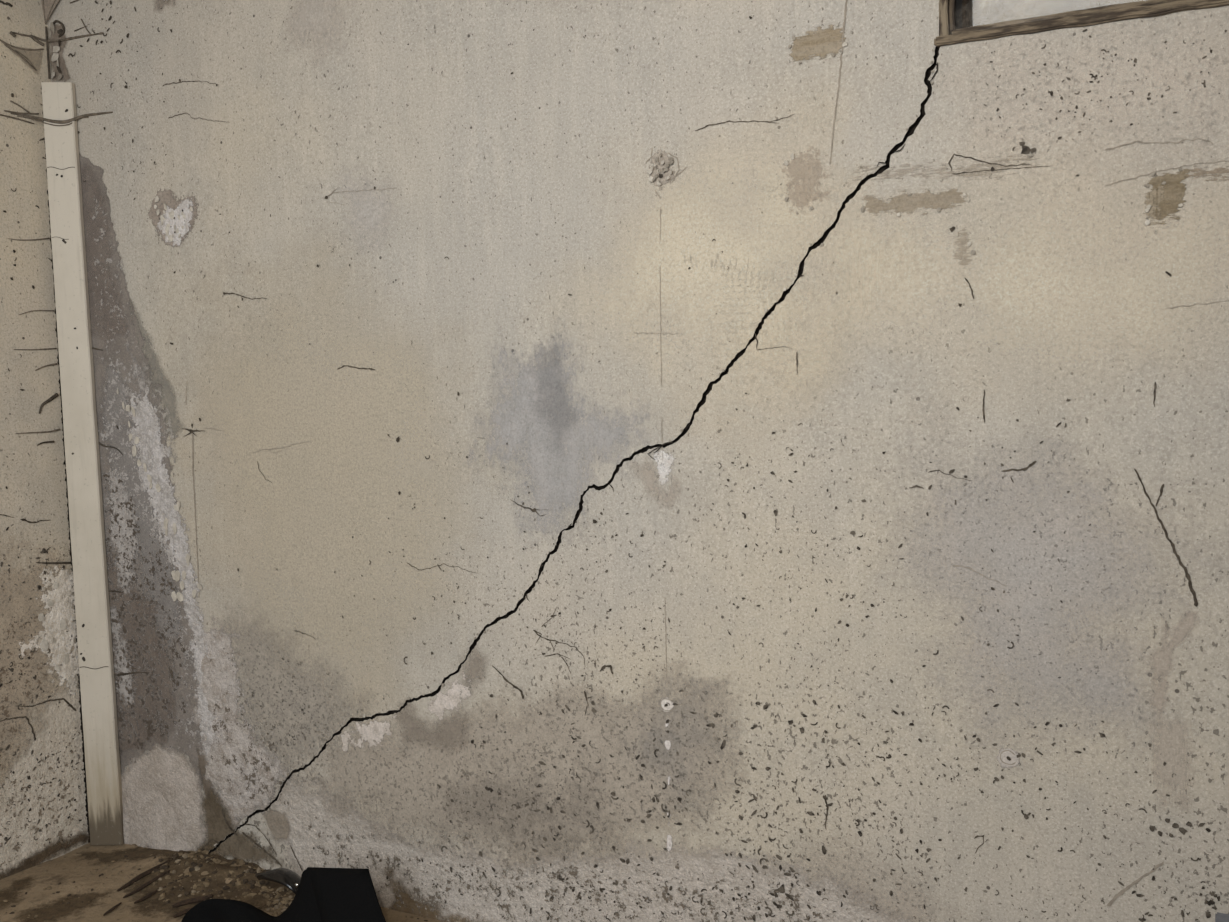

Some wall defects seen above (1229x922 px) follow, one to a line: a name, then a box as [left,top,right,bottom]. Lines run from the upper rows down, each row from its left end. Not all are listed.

leakage [0,562,88,873]
spalling [148,189,199,247]
leakage [79,154,922,922]
crack [202,47,939,872]